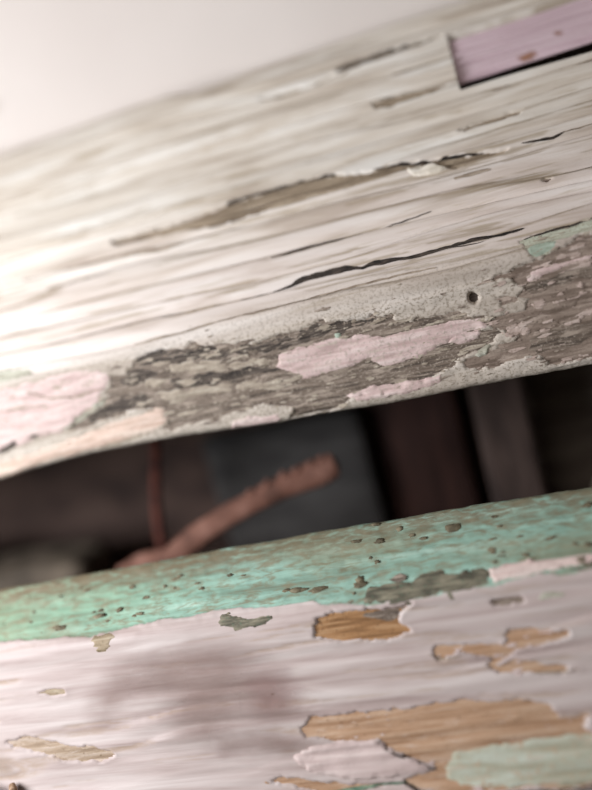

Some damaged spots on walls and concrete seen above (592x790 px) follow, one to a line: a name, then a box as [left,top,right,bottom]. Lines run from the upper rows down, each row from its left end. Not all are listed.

peeling [113,152,504,246]
crack [23,228,524,345]
peeling [0,217,592,477]
peeling [314,606,410,641]
peeling [430,627,579,676]
peeling [491,596,524,606]
peeling [488,554,592,583]
peeling [265,699,592,790]